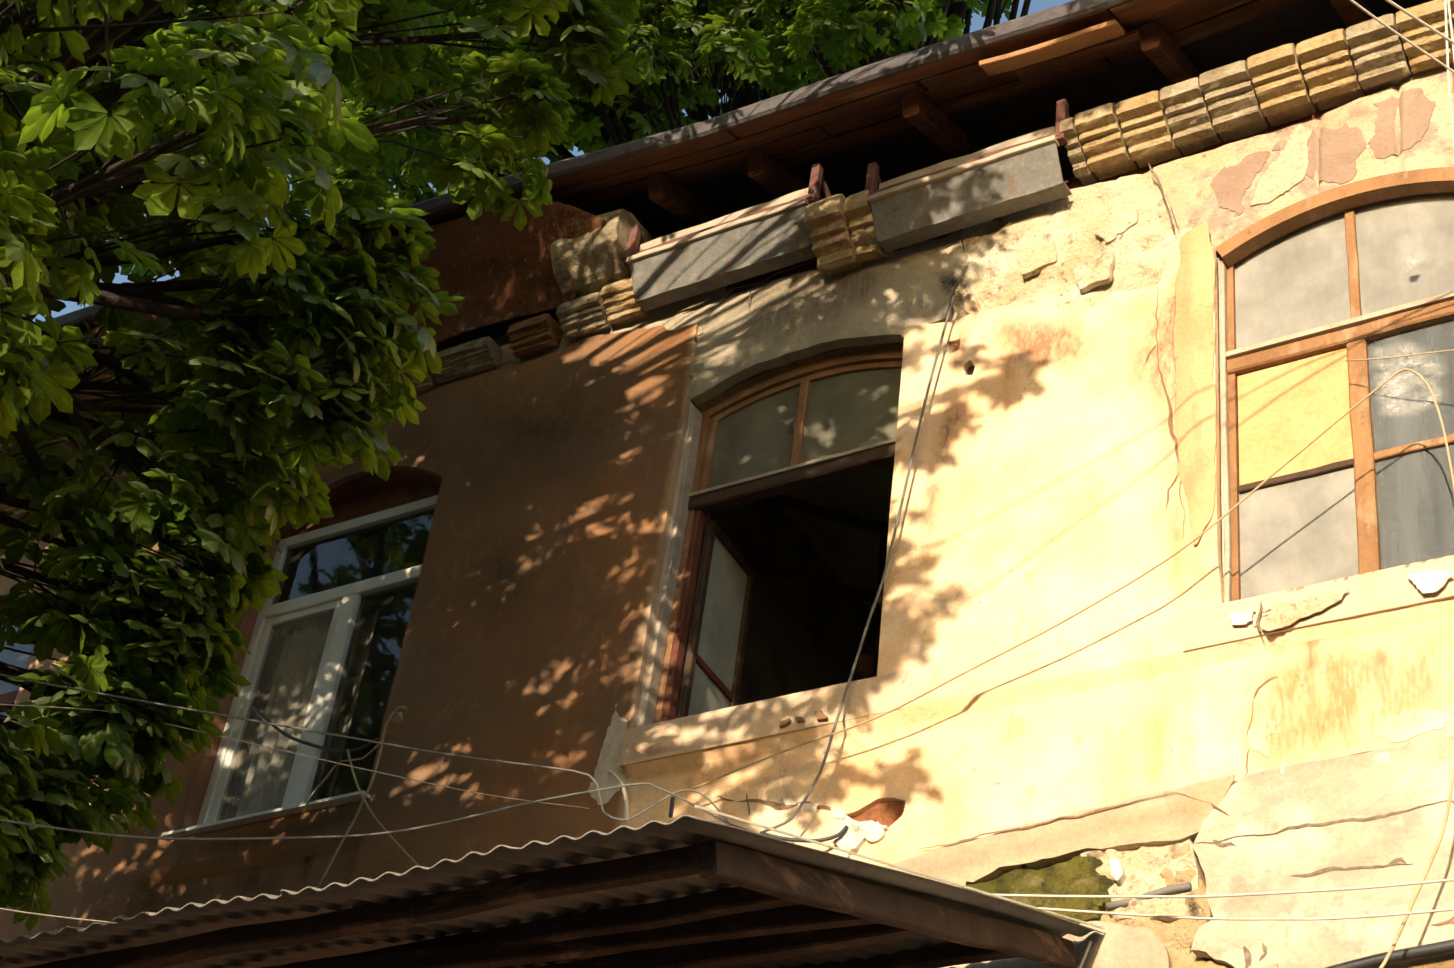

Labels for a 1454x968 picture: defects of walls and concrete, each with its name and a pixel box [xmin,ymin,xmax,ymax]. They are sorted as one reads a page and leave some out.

flaking render [950,64,1454,322]
crack [1144,286,1185,540]
peeling [1229,589,1349,631]
crack [1245,677,1278,775]
peeling [1372,696,1454,762]
flaking render [833,801,905,858]
crack [915,792,1454,850]
crack [1291,857,1409,877]
flaking render [1080,839,1230,968]
crack [1431,917,1454,926]